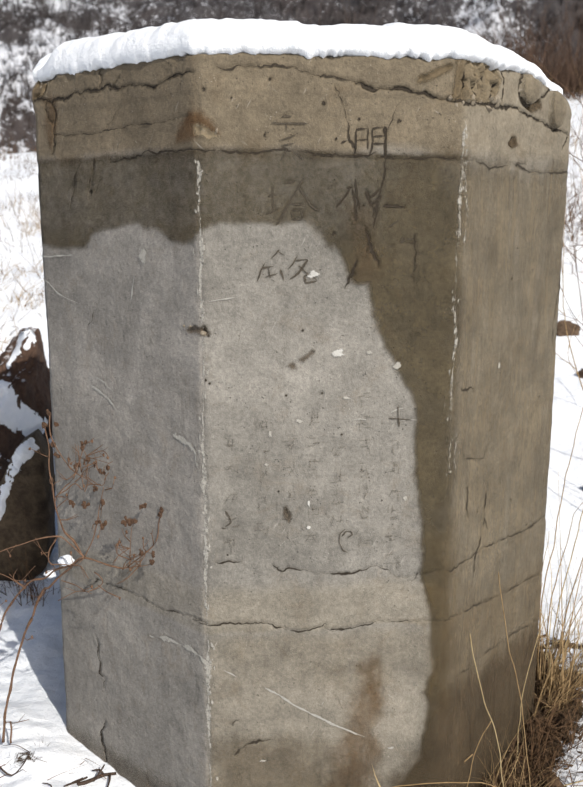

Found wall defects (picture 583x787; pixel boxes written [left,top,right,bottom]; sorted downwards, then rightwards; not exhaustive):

crack [36,68,190,154]
corrosion [178,113,214,139]
spalling [417,59,502,112]
spalling [526,99,542,112]
crack [66,63,568,287]
leakage [37,127,568,787]
crack [273,487,545,586]
crack [79,576,534,633]